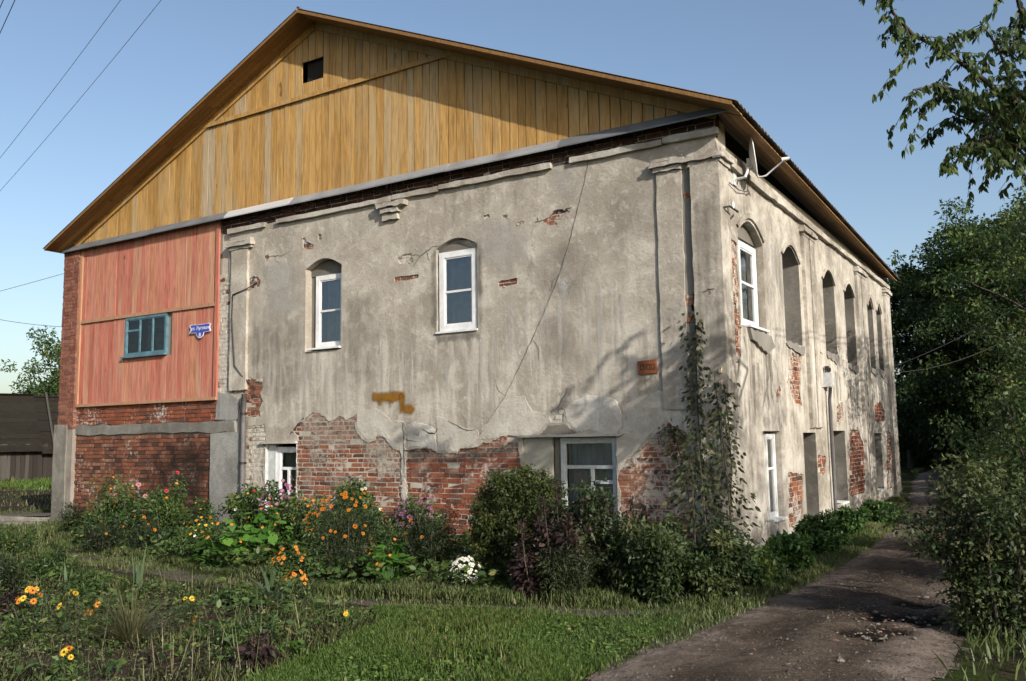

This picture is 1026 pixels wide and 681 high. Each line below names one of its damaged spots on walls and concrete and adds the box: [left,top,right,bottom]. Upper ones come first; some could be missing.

spalling [543,209,567,226]
spalling [395,254,419,282]
crack [402,163,588,459]
spalling [499,278,517,287]
spalling [218,272,266,513]
spalling [776,351,802,405]
spalling [292,413,521,548]
spalling [618,423,699,547]
spalling [788,472,803,527]
spalling [818,454,826,475]
spalling [836,402,865,497]
spalling [875,402,892,490]